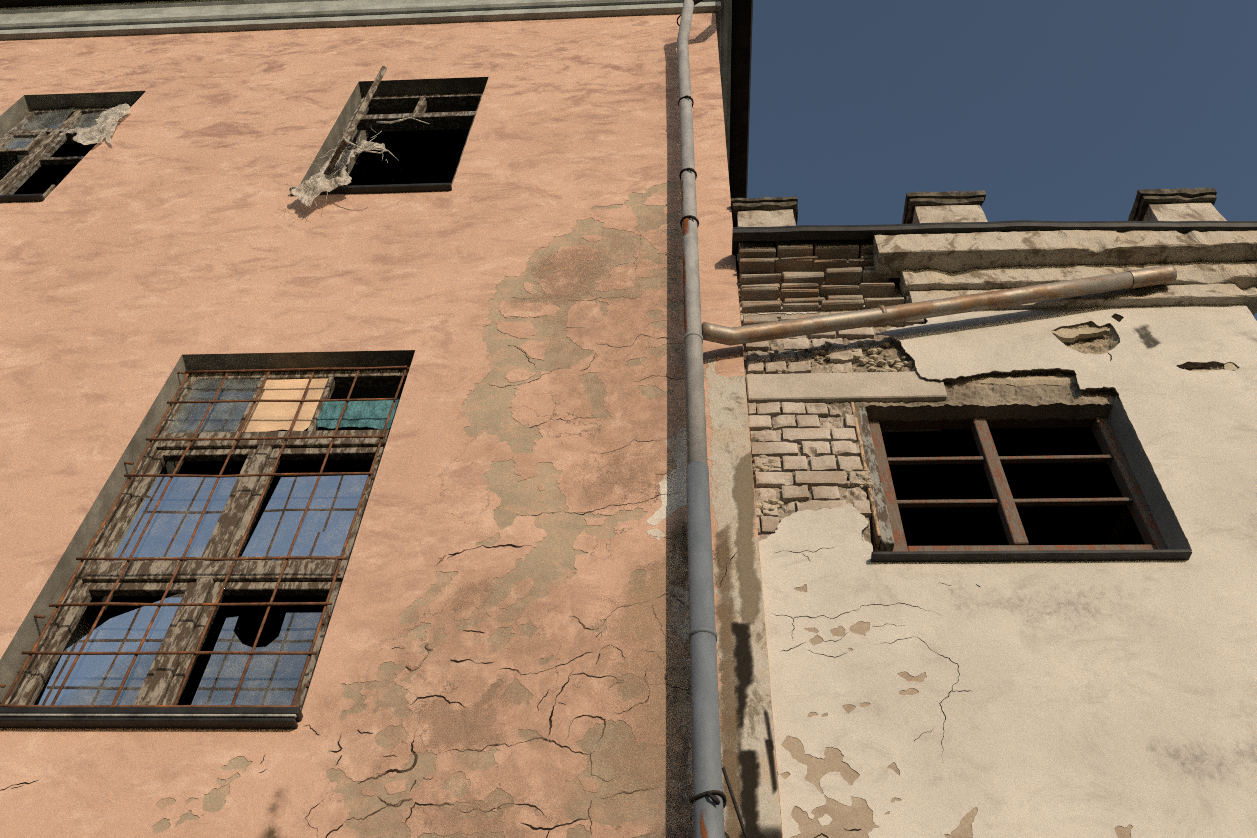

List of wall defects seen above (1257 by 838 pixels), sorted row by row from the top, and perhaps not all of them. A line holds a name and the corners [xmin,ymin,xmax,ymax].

flaking render [738,240,910,326]
spalling [1177,363,1238,372]
flaking render [326,182,693,838]
flaking render [706,315,1123,838]
crack [305,593,690,838]
crack [771,602,971,759]
spalling [152,756,252,834]
spalling [1114,825,1132,838]